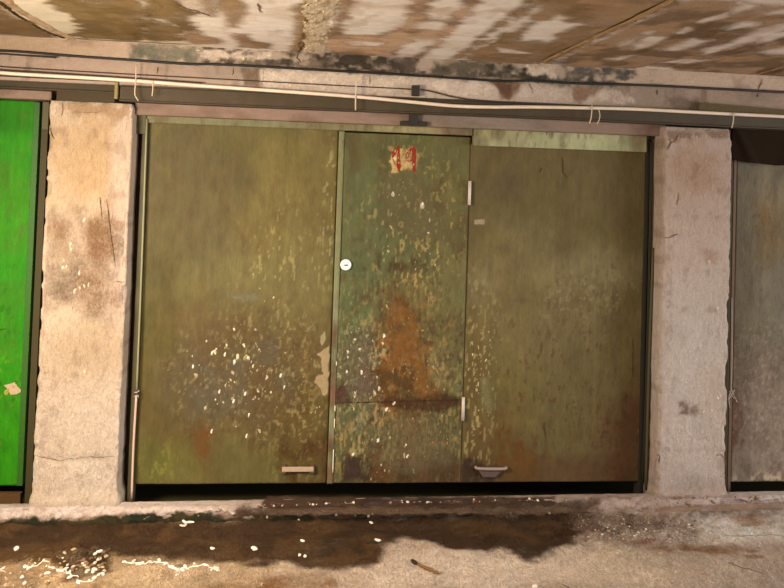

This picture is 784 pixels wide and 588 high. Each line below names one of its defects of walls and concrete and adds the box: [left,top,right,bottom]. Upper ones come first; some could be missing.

water stain [0,7,57,38]
water stain [46,0,784,101]
peeling [4,382,21,395]
peeling [186,324,292,438]
peeling [301,331,330,396]
rust [383,394,456,412]
water stain [0,495,664,580]